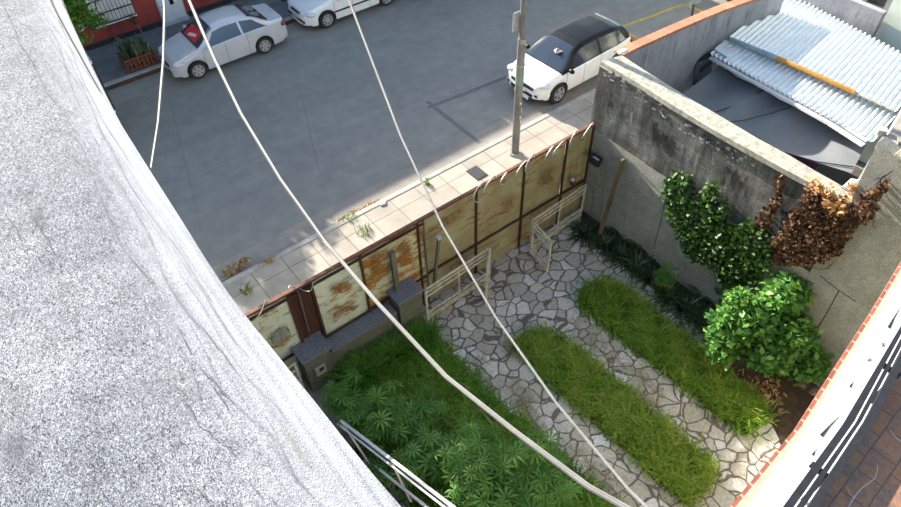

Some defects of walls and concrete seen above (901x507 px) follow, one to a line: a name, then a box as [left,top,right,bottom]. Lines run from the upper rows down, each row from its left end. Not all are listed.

crack [1,0,90,170]
crack [0,184,87,275]
rust [397,237,413,270]
rust [330,277,359,324]
crack [176,321,242,407]
crack [170,380,234,452]